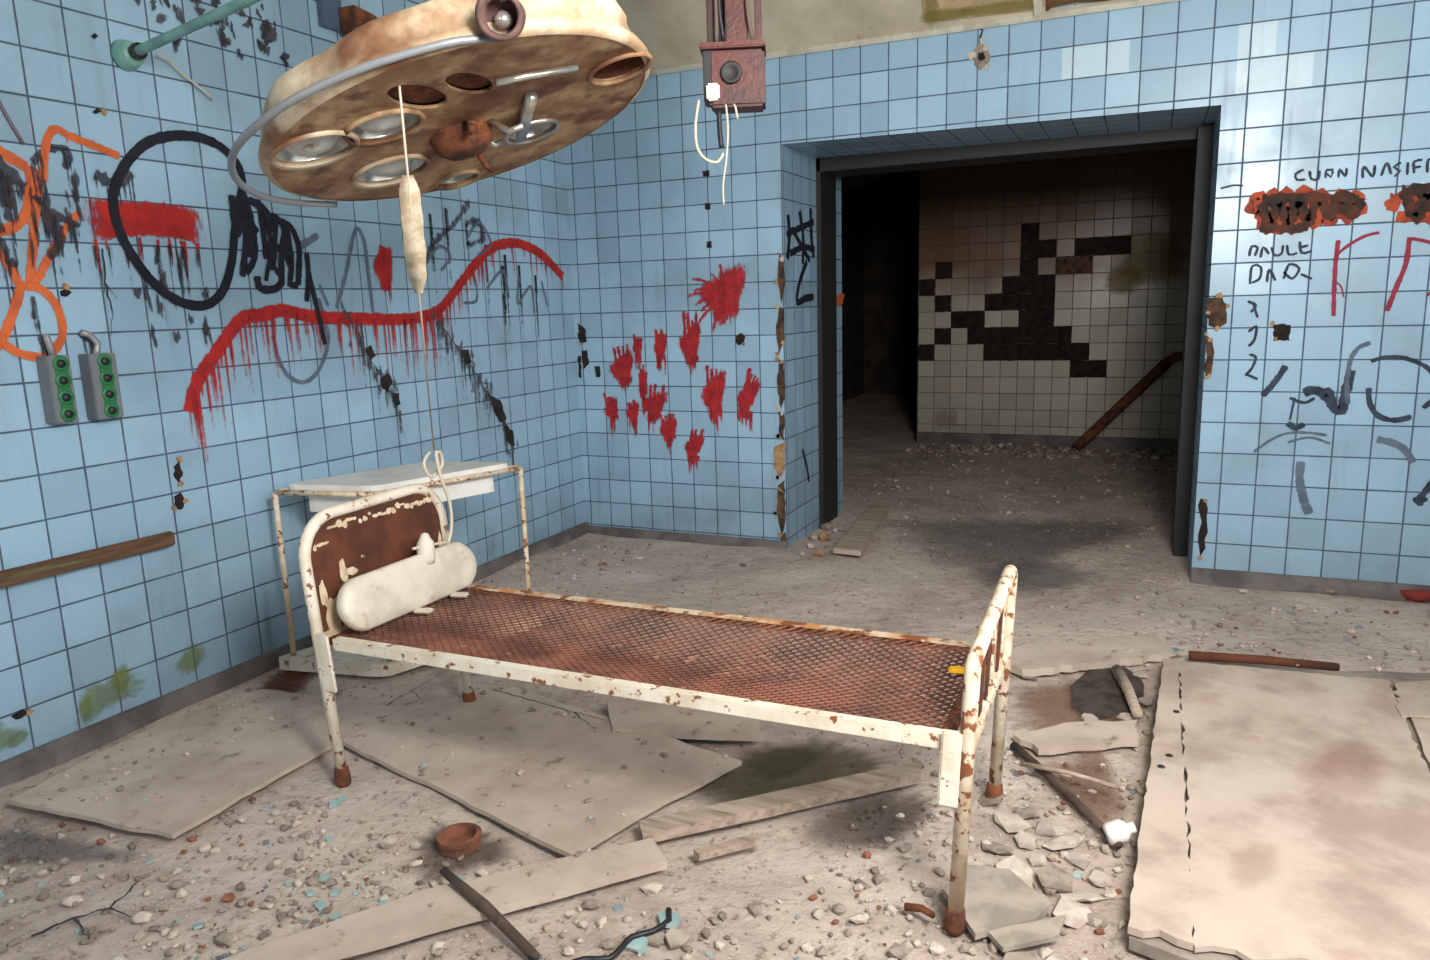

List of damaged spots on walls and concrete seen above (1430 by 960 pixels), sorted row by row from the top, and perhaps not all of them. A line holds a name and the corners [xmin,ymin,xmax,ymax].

spalling [968,29,991,70]
spalling [1202,292,1230,379]
spalling [773,252,786,541]
spalling [1070,666,1154,721]
water stain [705,740,878,801]
crack [31,881,139,940]